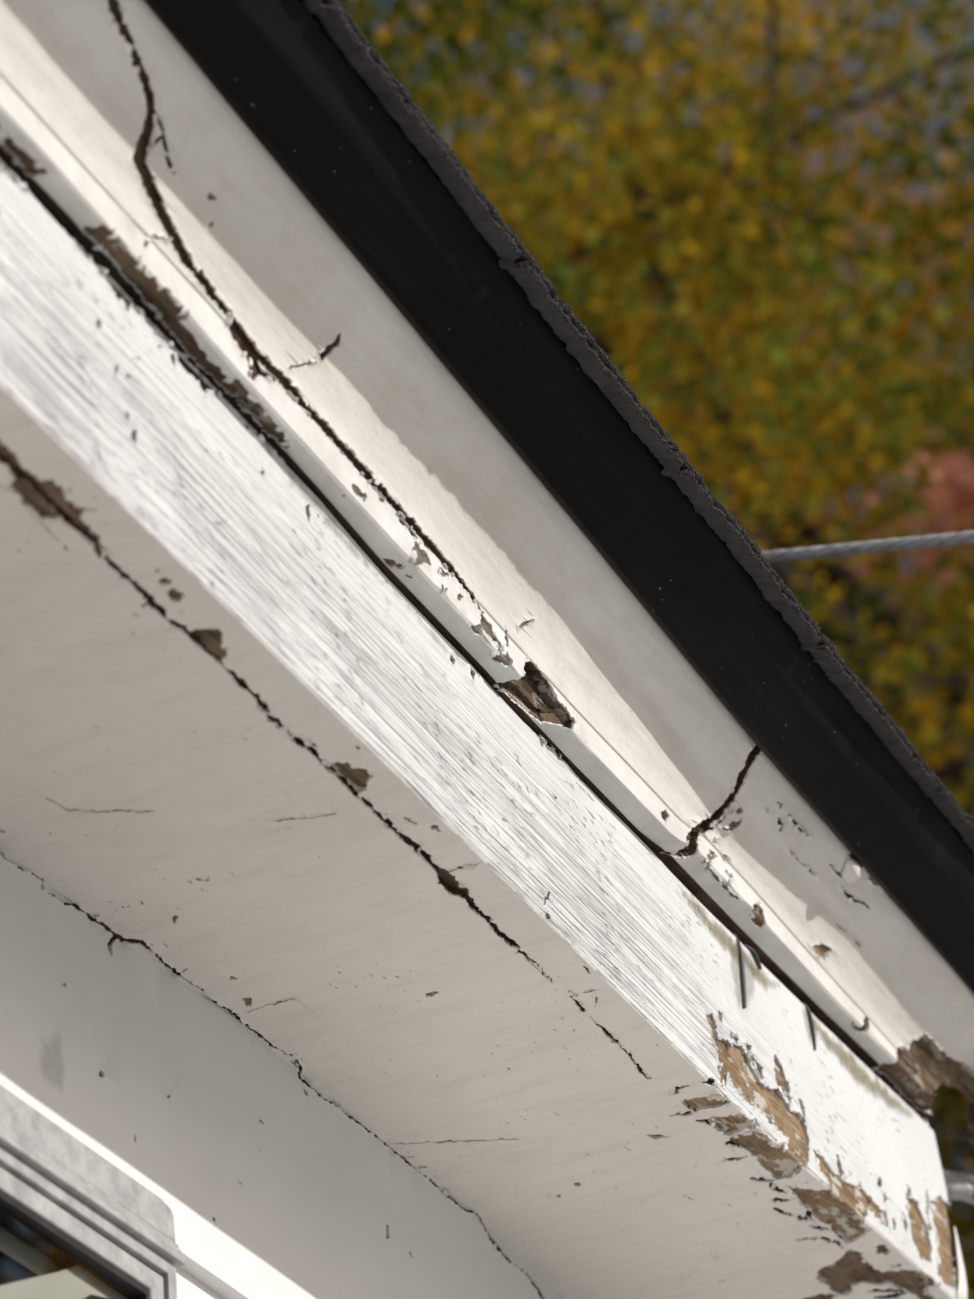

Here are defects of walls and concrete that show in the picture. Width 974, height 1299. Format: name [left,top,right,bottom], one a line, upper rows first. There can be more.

peeling [0,130,50,194]
peeling [60,223,290,460]
crack [105,0,484,614]
crack [0,442,717,1094]
crack [660,746,881,948]
crack [0,830,545,1299]
peeling [668,1011,968,1299]